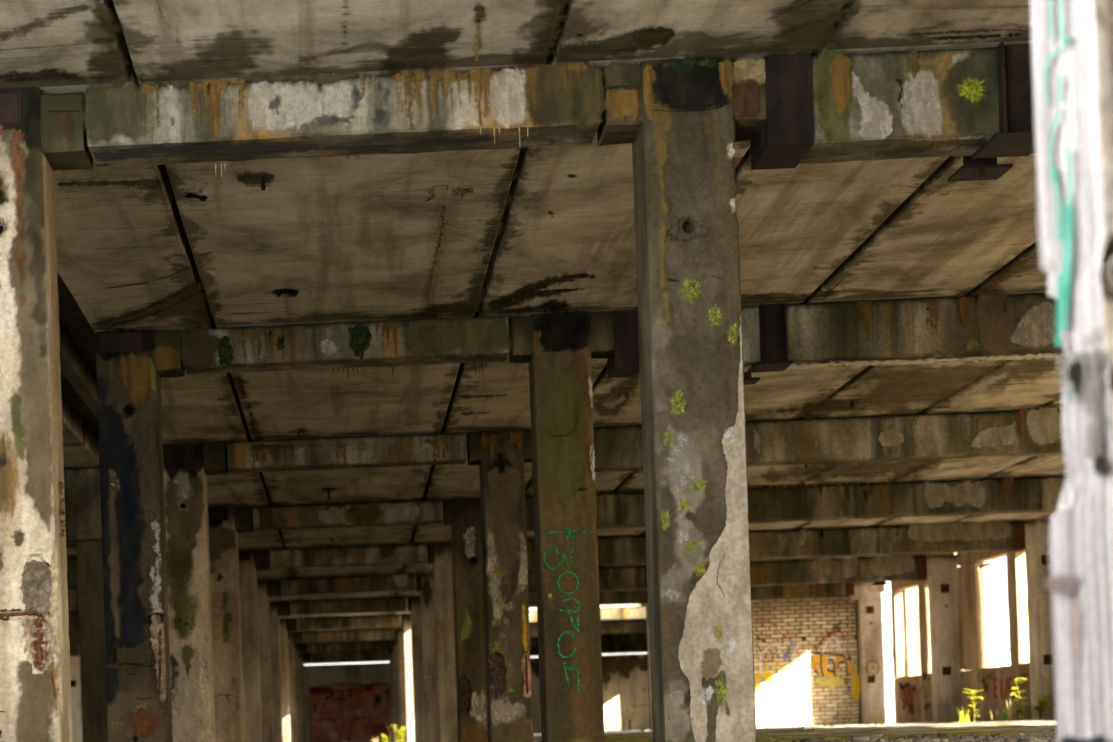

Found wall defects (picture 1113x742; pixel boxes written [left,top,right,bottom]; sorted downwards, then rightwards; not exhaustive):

rust [394,68,493,128]
leakage [497,0,858,128]
peeling [851,71,942,140]
leakage [0,0,497,529]
spalling [0,560,57,699]
leakage [108,485,121,639]
leakage [107,655,189,742]
peeling [678,314,761,742]